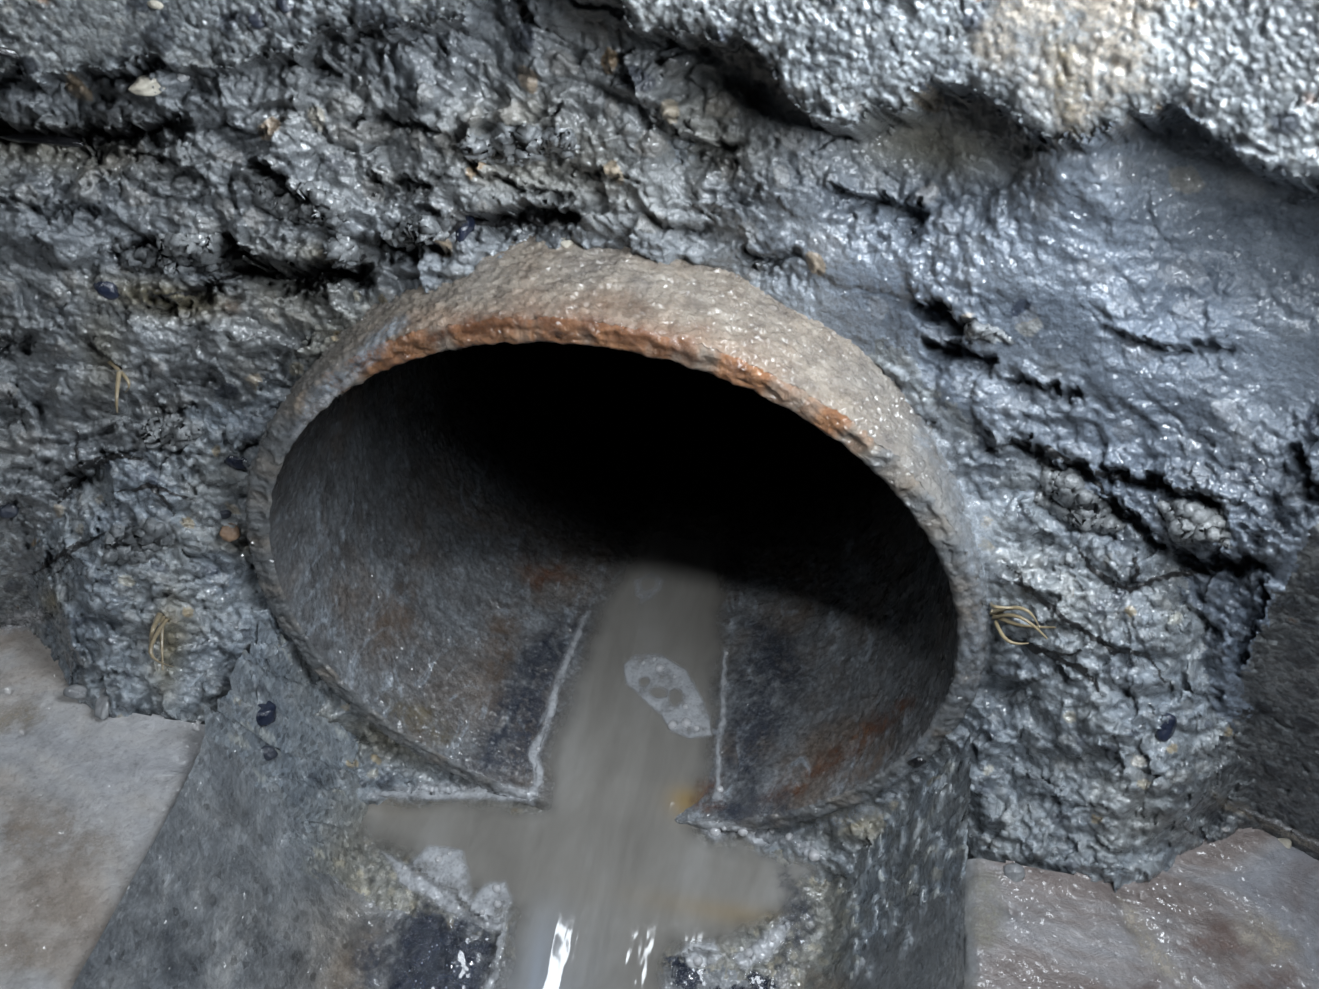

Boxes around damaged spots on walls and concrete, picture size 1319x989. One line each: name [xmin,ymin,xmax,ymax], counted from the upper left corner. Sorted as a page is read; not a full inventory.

spalling [0,0,1319,733]
crack [1005,438,1268,593]
water stain [480,640,567,770]
water stain [730,625,798,774]
crack [990,565,1168,696]
water stain [663,955,706,989]